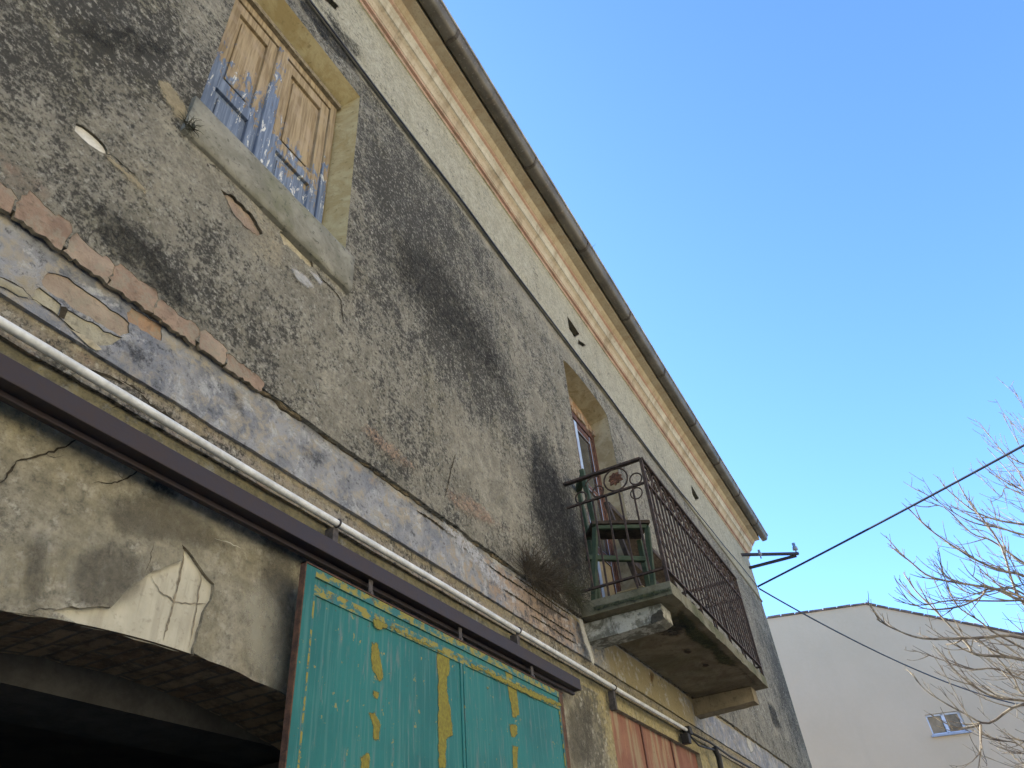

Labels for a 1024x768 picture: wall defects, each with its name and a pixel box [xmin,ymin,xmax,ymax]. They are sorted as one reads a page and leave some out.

spalling [75,123,146,194]
flaking render [0,182,264,392]
leakage [399,245,501,379]
crack [0,440,76,483]
leakage [532,438,578,586]
peeling [361,753,370,768]
peeling [369,712,381,740]
peeling [371,643,383,699]
peeling [373,618,458,768]
peeling [471,663,562,768]